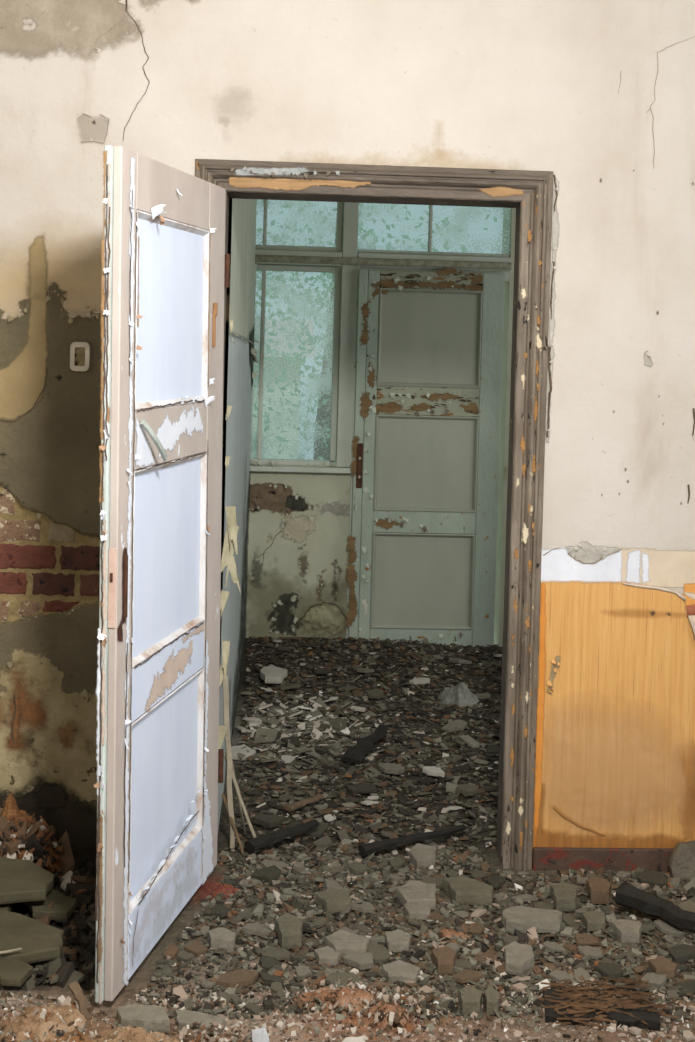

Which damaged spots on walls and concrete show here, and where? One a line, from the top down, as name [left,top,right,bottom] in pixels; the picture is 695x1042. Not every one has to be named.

spalling [0,0,141,58]
crack [94,0,150,139]
crack [647,36,695,165]
spalling [0,282,110,810]
spalling [268,593,303,636]
spalling [249,483,350,516]
peeling [298,545,309,577]
peeling [506,506,695,851]